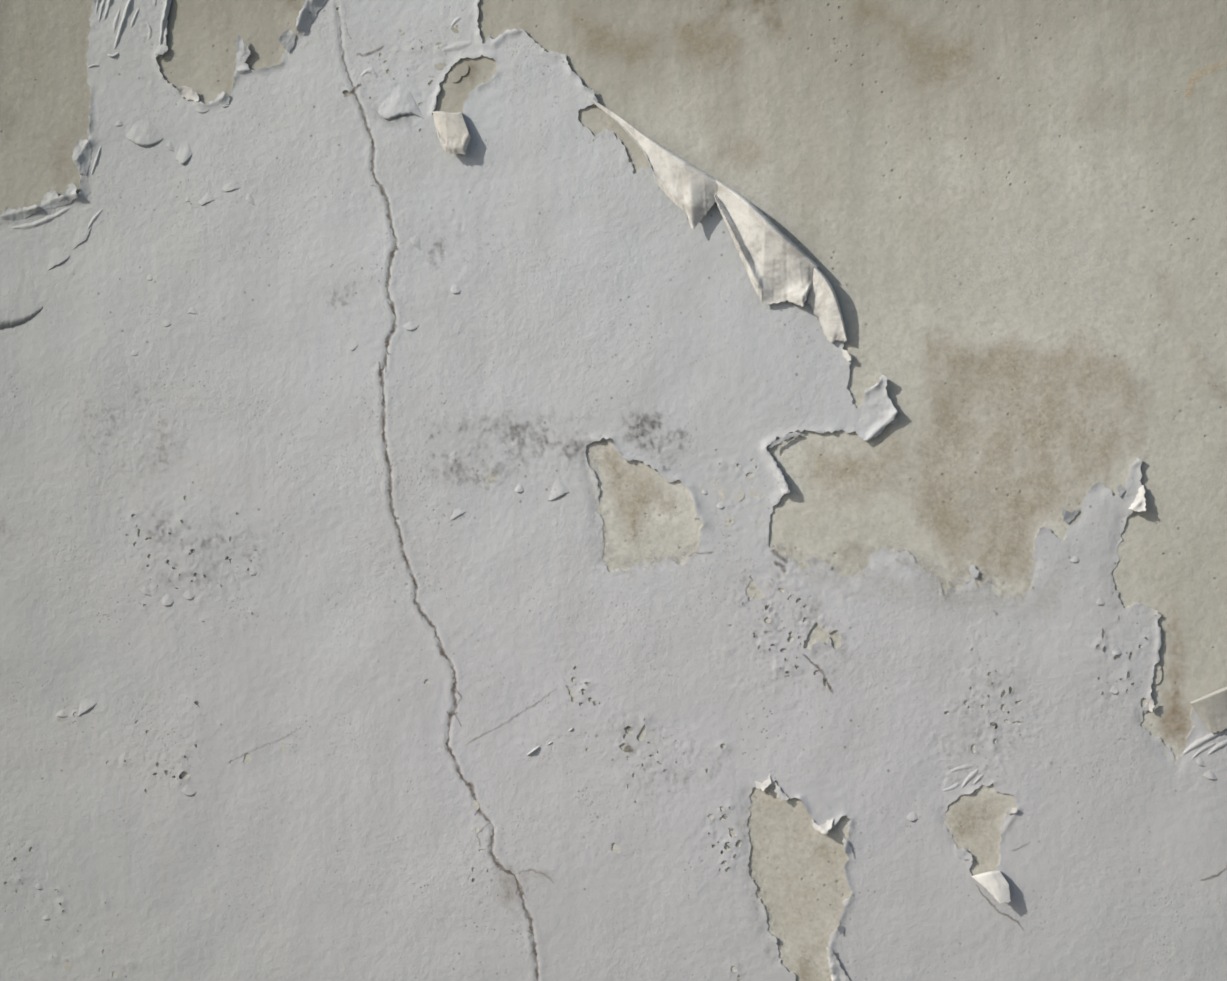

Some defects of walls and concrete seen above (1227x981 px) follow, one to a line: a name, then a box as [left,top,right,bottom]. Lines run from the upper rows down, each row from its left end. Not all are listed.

peeling [0,0,93,220]
peeling [154,0,339,105]
peeling [412,0,1227,764]
crack [350,80,538,979]
spalling [619,718,686,788]
peeling [708,774,853,981]
peeling [945,783,1017,903]